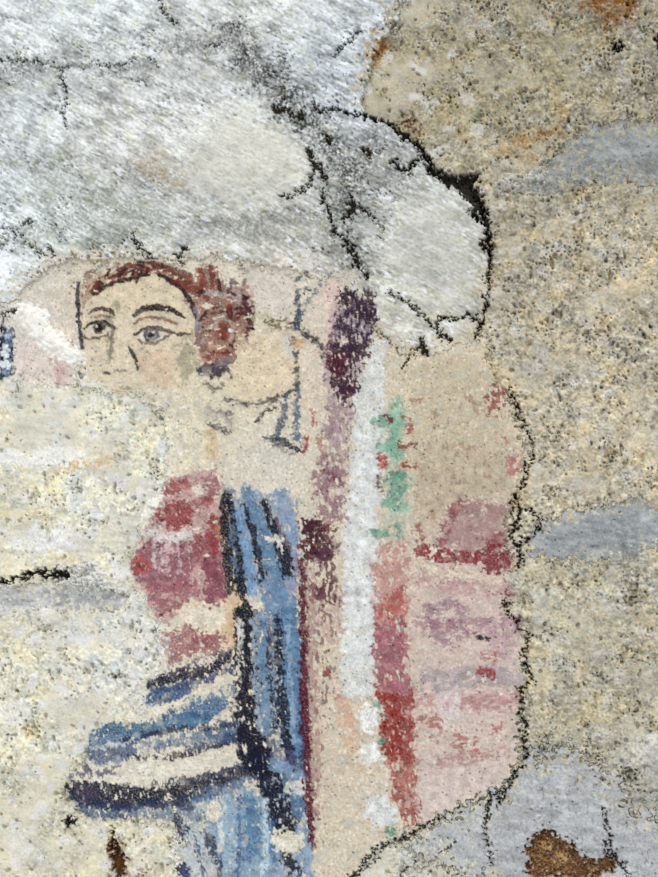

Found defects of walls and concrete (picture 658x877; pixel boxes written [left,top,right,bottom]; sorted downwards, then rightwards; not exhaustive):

crack [156,0,179,26]
crack [330,23,362,59]
hole [603,35,627,56]
crack [0,54,160,132]
crack [0,215,56,263]
crack [130,231,191,268]
crack [267,96,497,370]
crack [0,303,18,318]
crack [504,385,548,572]
crack [0,564,71,586]
crack [347,596,537,877]
rust [95,822,158,877]